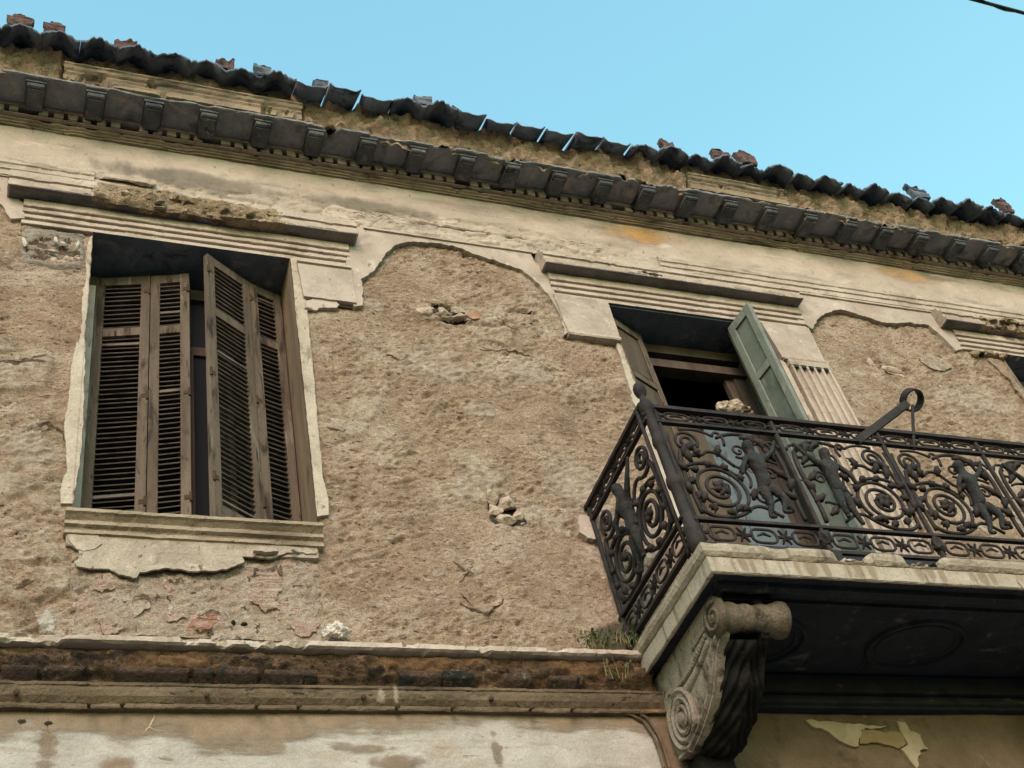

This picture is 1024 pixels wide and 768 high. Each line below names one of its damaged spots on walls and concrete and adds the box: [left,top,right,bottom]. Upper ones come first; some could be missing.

spalling [91,185,271,226]
spalling [19,227,86,270]
hole [415,305,482,325]
spalling [867,357,904,378]
peeling [987,358,1024,404]
hole [486,489,527,526]
spalling [0,534,653,691]
leakage [0,712,665,768]
peeling [804,719,928,768]